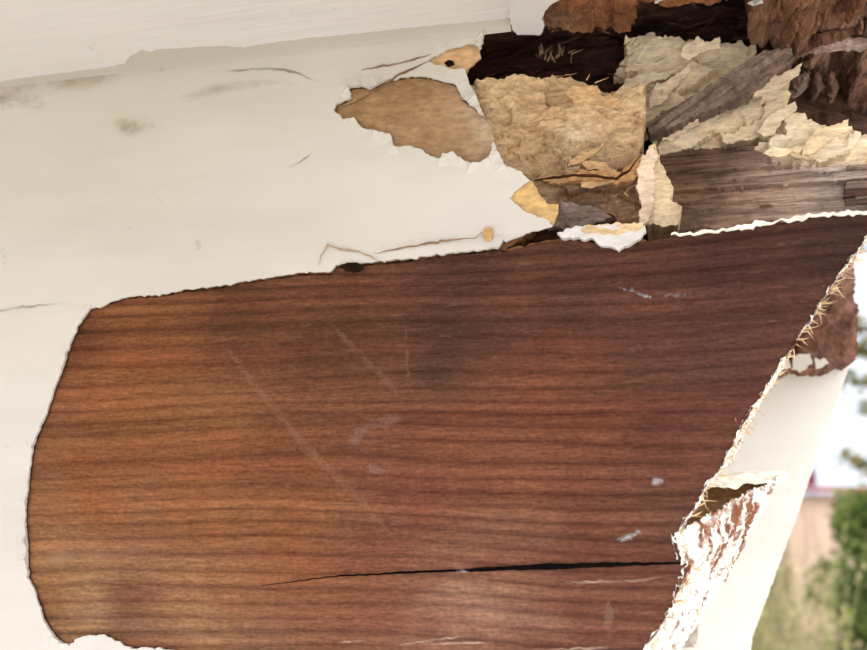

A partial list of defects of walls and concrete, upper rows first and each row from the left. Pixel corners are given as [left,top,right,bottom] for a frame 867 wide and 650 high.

spalling [690,0,763,11]
peeling [335,78,495,163]
peeling [430,45,481,74]
peeling [565,85,623,108]
peeling [614,32,757,122]
peeling [753,63,867,169]
peeling [28,119,867,650]
crack [261,562,680,586]